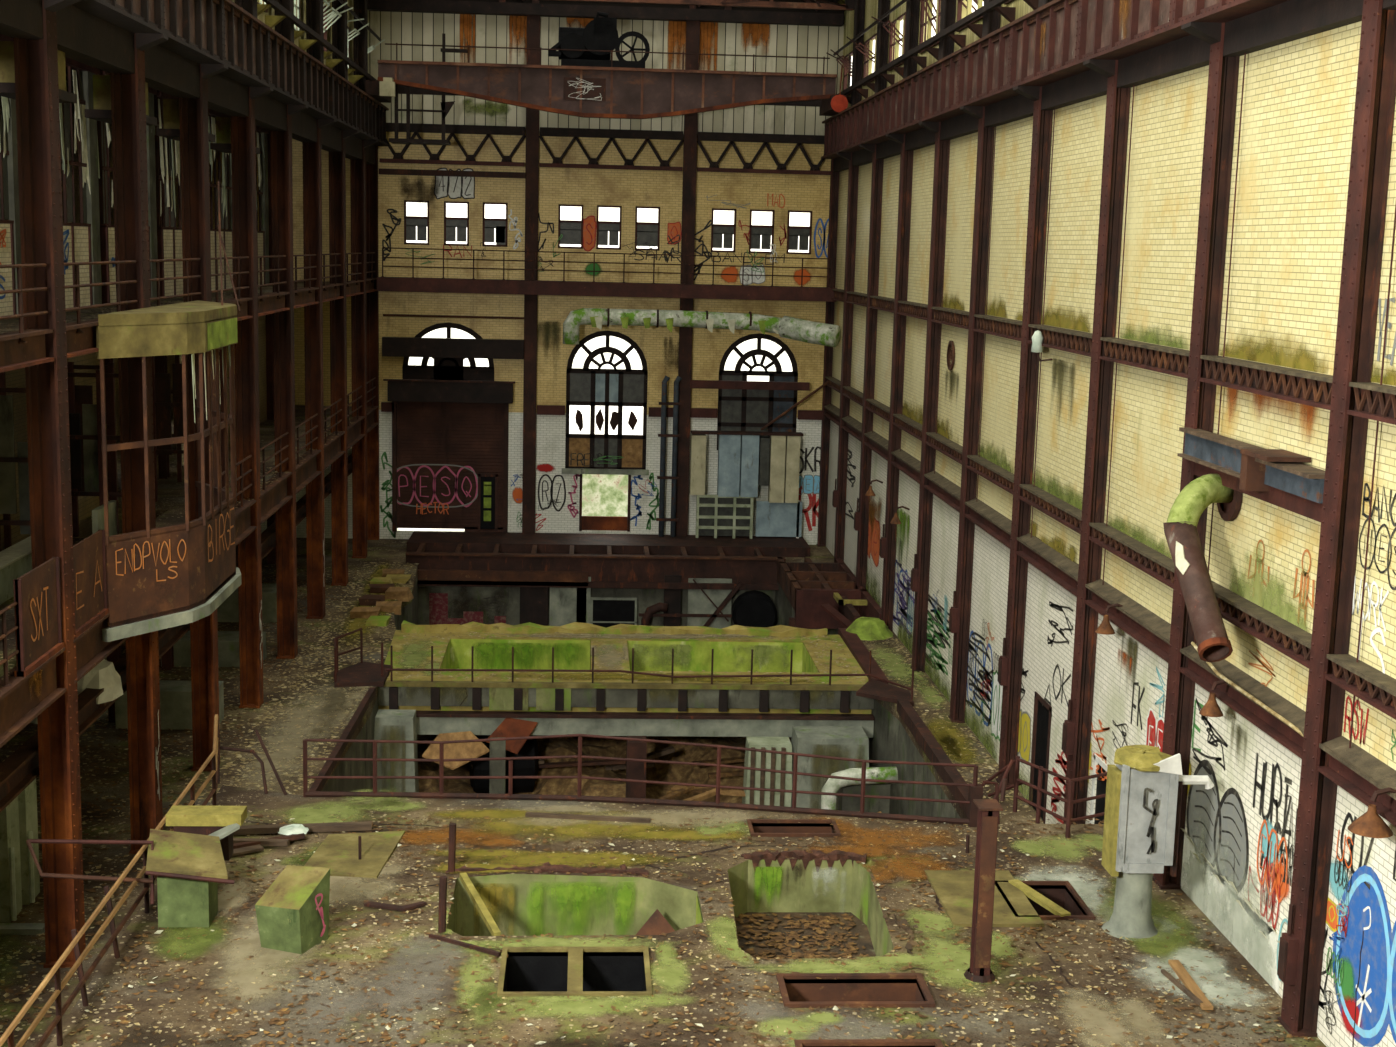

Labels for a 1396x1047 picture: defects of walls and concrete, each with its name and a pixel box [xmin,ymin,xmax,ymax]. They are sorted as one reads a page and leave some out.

corrosion [460,14,476,59]
corrosion [509,16,527,57]
corrosion [668,21,718,71]
corrosion [742,24,770,46]
damp [1053,361,1074,393]